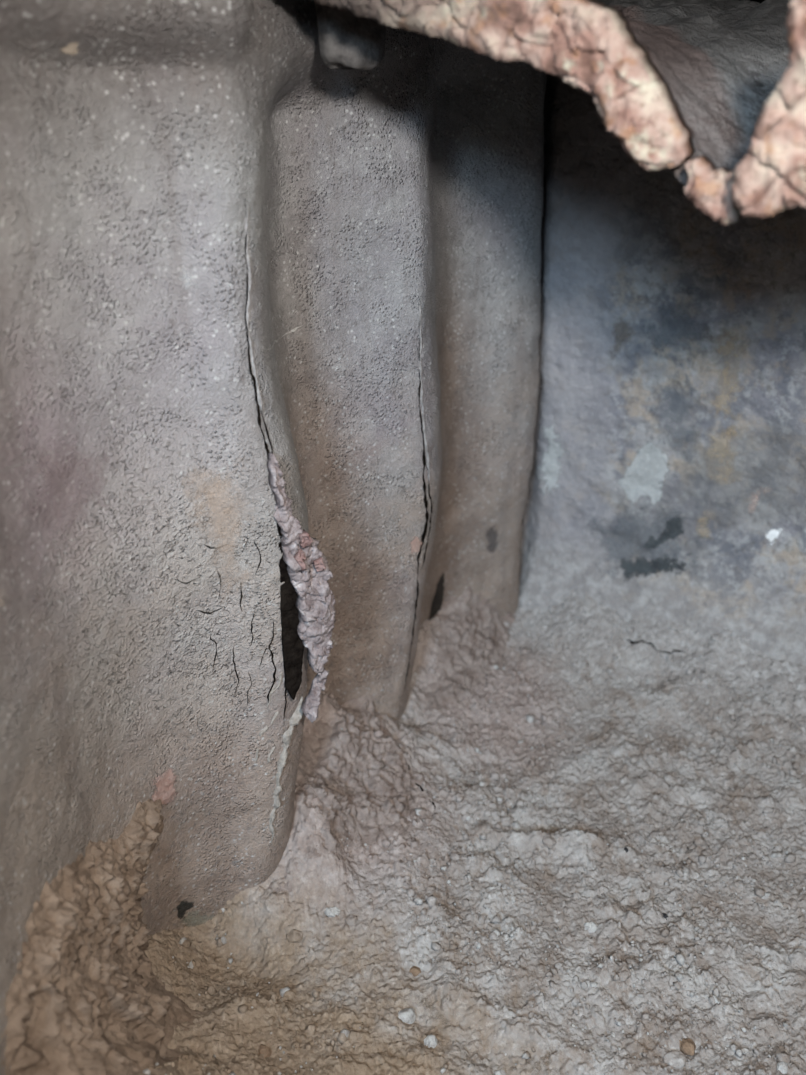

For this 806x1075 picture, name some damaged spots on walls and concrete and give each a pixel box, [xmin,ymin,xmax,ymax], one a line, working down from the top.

spalling [314,0,695,171]
crack [244,195,274,493]
crack [405,301,433,685]
damp [765,528,782,545]
spalling [255,529,329,844]